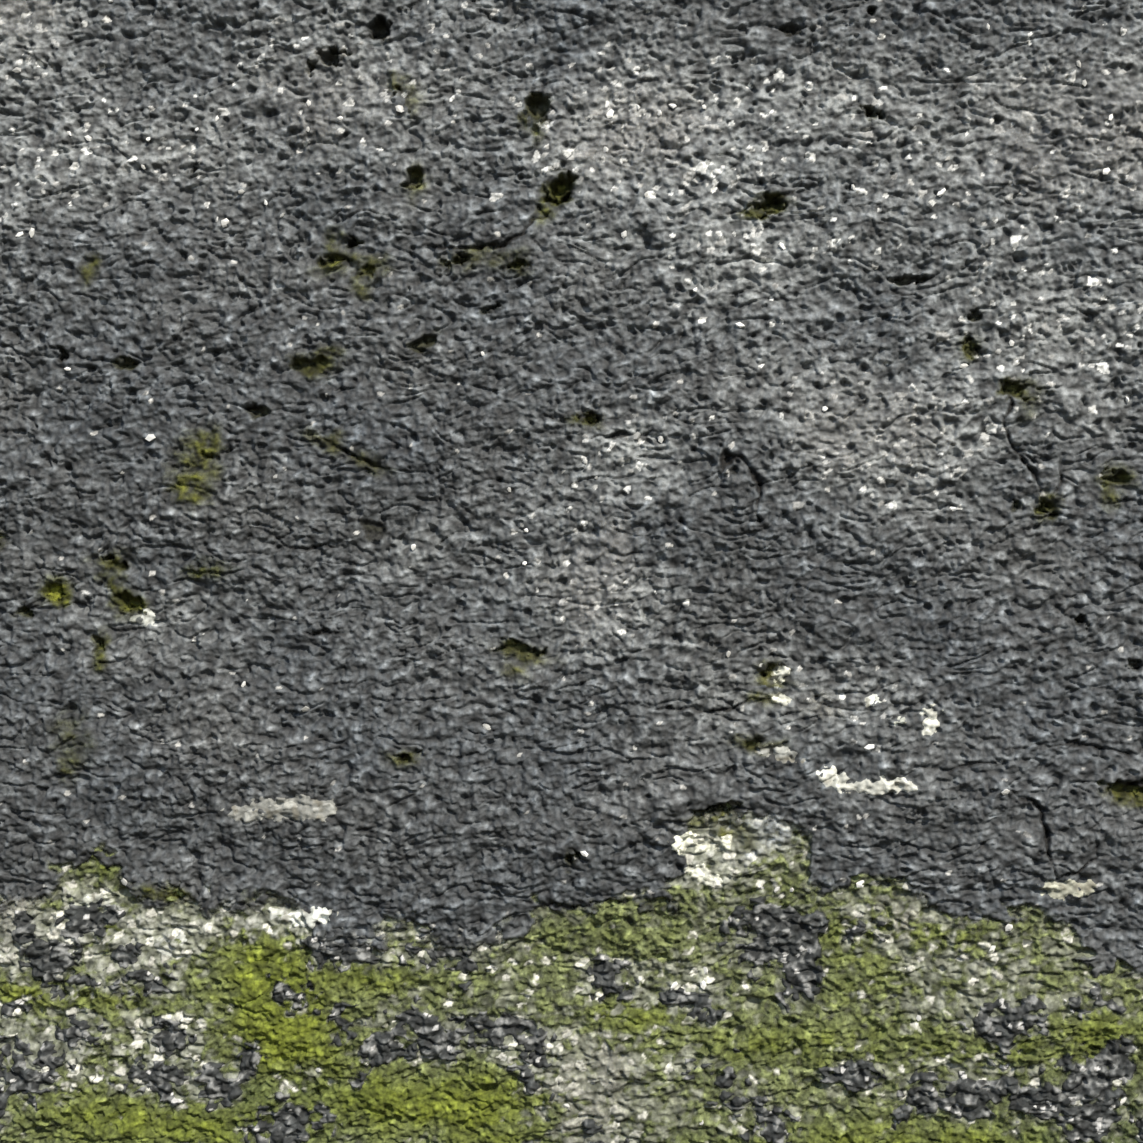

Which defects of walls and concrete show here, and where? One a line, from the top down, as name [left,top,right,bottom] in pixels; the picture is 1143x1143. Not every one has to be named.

peeling [220,794,337,824]
spalling [0,801,1143,1143]